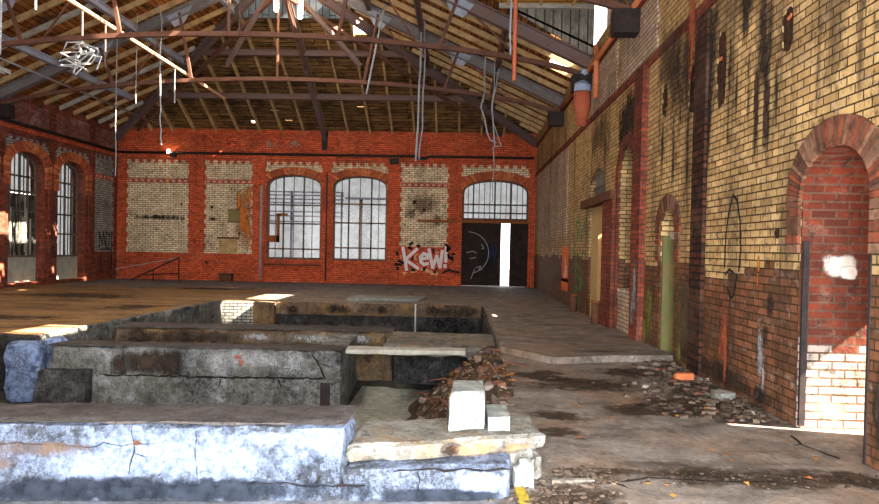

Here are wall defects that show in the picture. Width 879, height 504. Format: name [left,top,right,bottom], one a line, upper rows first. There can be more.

damp [659,31,675,184]
damp [727,39,779,155]
crack [0,426,150,473]
crack [393,467,510,489]